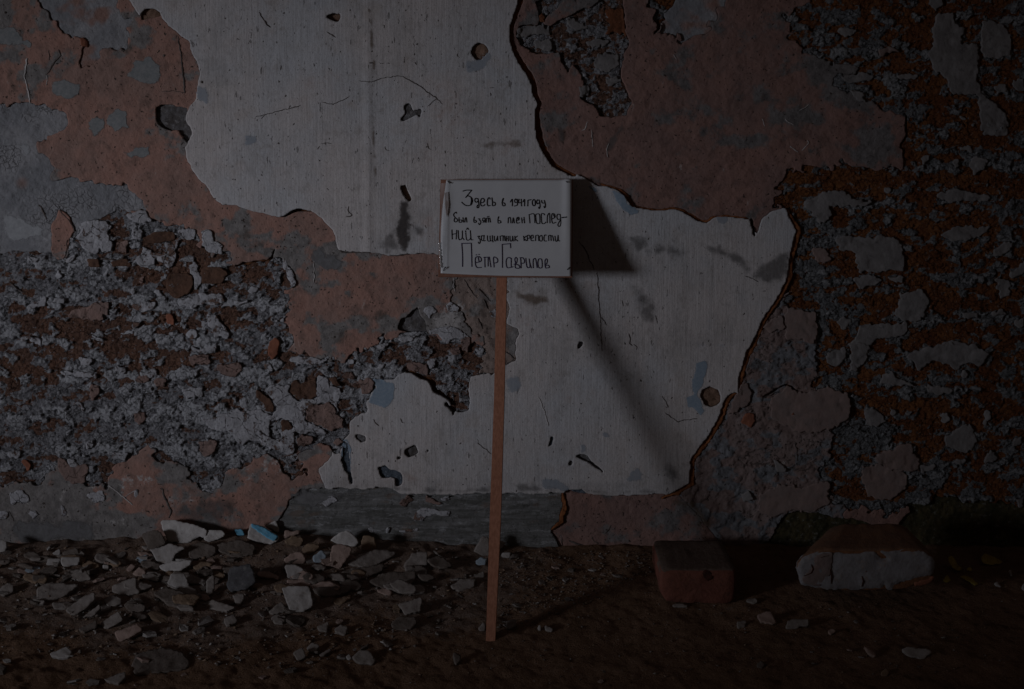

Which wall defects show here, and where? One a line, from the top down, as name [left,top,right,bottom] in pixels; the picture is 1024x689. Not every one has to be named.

spalling [0,0,519,642]
crack [256,75,442,119]
spalling [500,0,1024,558]